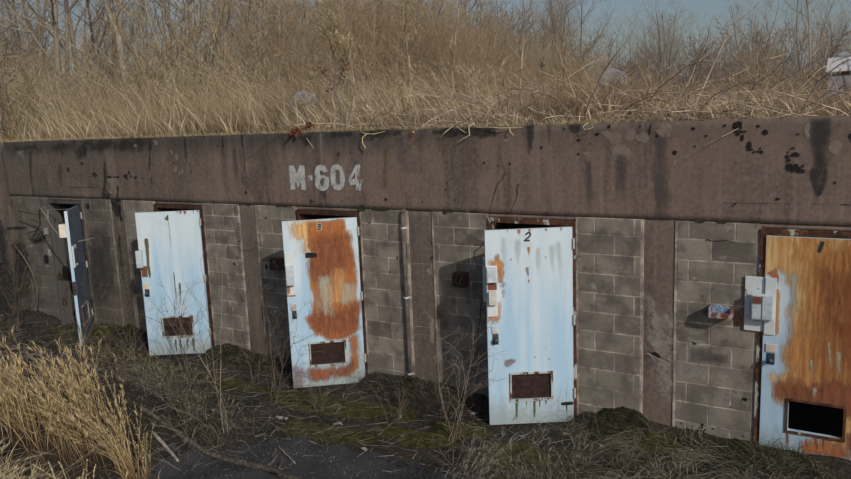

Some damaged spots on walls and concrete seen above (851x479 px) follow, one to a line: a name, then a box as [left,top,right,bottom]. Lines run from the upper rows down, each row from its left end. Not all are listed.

damp [811,120,830,195]
rust [291,219,359,381]
rust [490,259,503,280]
rust [763,236,851,459]